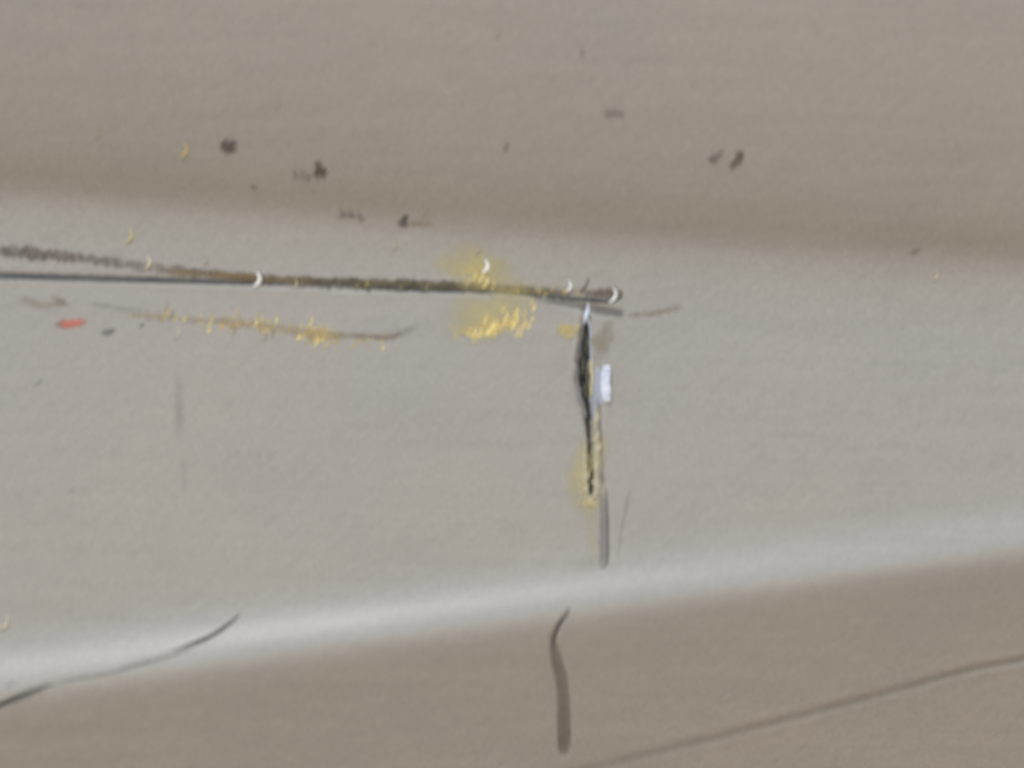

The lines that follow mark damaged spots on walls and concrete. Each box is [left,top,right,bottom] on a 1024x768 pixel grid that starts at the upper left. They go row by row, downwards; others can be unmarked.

crack [122,616,239,670]
crack [0,685,48,707]